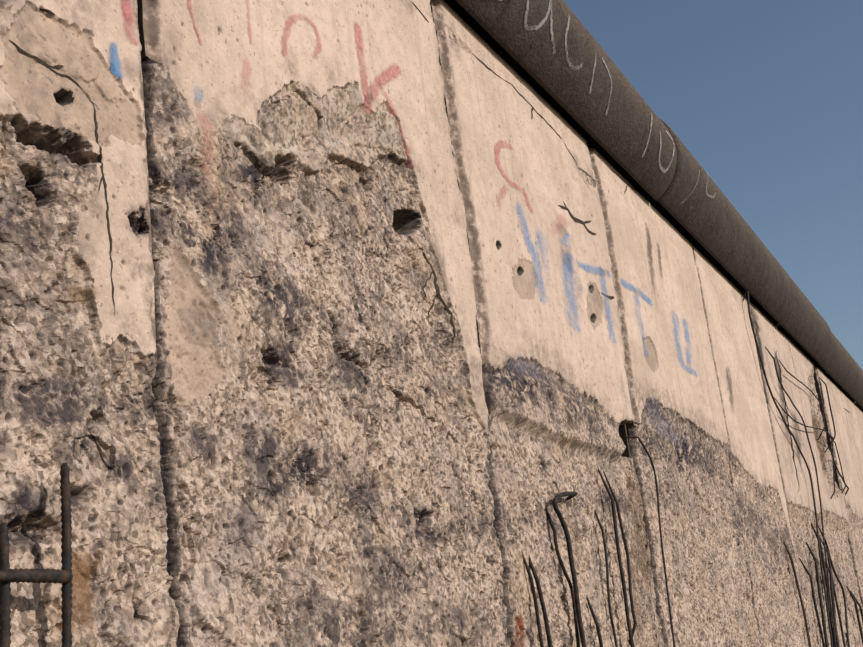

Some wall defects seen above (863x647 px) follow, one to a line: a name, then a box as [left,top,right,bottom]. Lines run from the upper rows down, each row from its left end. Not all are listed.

crack [9,39,115,306]
spalling [0,0,180,647]
spalling [141,56,863,647]
crack [469,50,577,164]